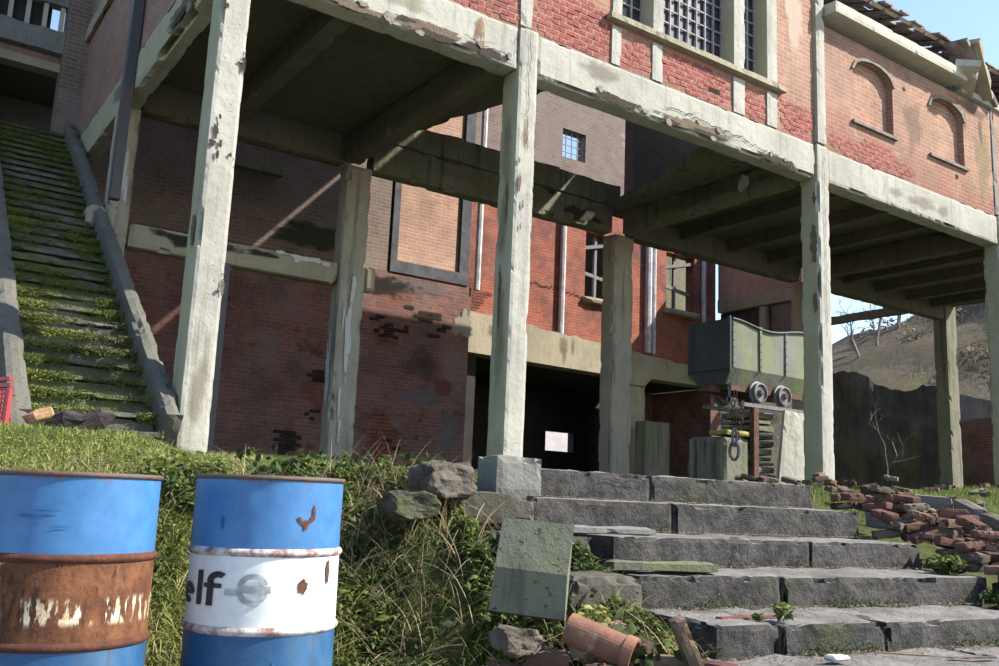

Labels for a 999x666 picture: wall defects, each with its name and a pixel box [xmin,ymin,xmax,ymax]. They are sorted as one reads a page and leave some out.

spalling [165,0,194,34]
spalling [324,0,520,61]
spalling [532,0,731,105]
spalling [209,113,232,159]
spalling [592,85,729,142]
spalling [752,150,797,170]
spalling [745,88,815,142]
spalling [826,133,916,179]
spalling [369,265,501,347]
spalling [300,275,357,443]
spalling [360,407,402,461]